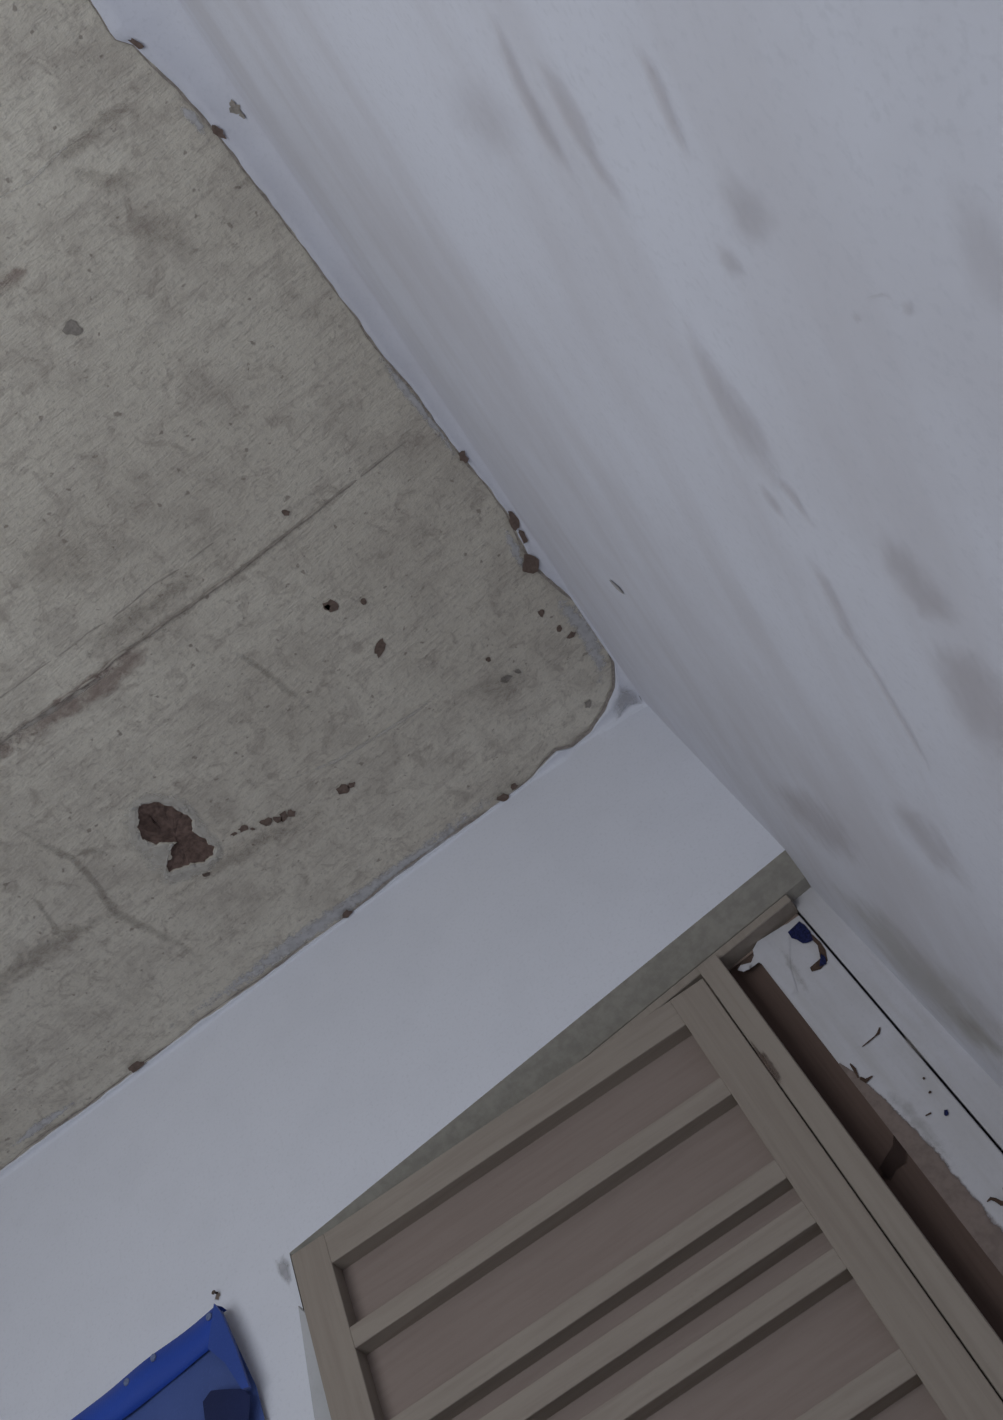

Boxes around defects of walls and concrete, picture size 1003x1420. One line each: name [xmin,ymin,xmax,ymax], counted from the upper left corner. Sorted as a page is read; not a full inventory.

peeling [212,125,226,139]
spalling [62,319,83,336]
peeling [508,511,539,574]
spalling [323,599,339,612]
spalling [374,638,386,658]
spalling [336,782,355,795]
peeling [497,783,518,802]
spalling [131,802,220,879]
peeling [738,920,828,994]
peeling [128,1061,144,1073]
peeling [839,1063,1003,1275]